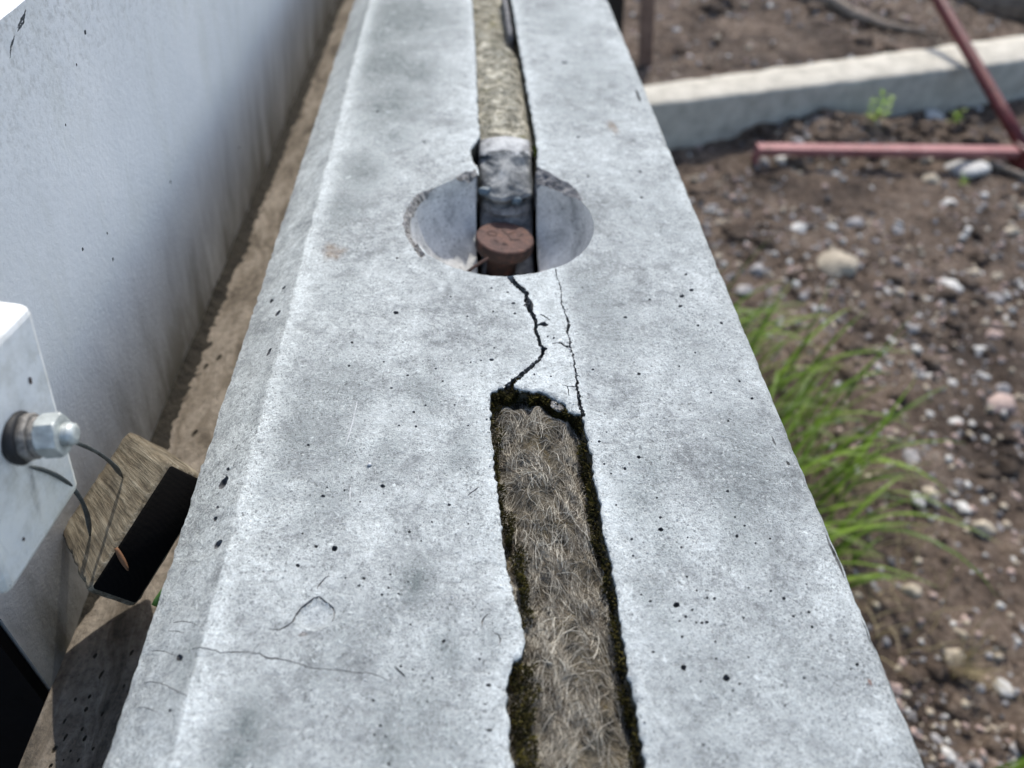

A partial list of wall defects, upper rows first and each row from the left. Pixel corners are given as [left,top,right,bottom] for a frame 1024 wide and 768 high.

crack [506,269,586,422]